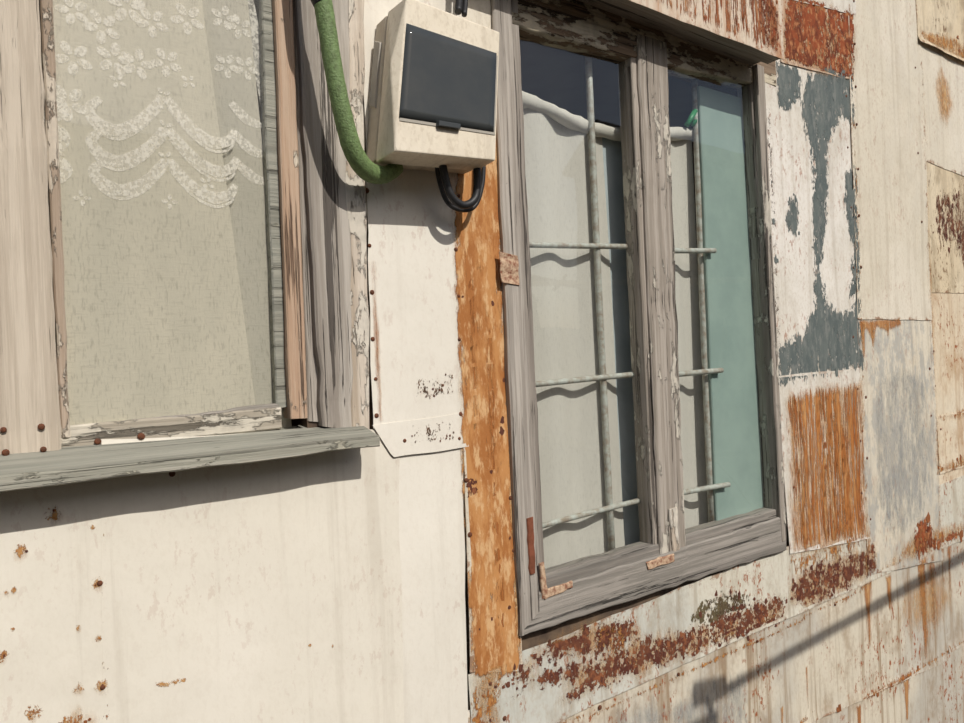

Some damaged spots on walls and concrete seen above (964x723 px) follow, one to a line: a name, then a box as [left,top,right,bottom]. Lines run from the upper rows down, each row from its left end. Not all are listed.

rust [656,0,855,81]
peeling [766,61,864,386]
rust [933,189,964,267]
rust [786,375,870,550]
rust [563,582,871,723]
rust [857,511,964,723]